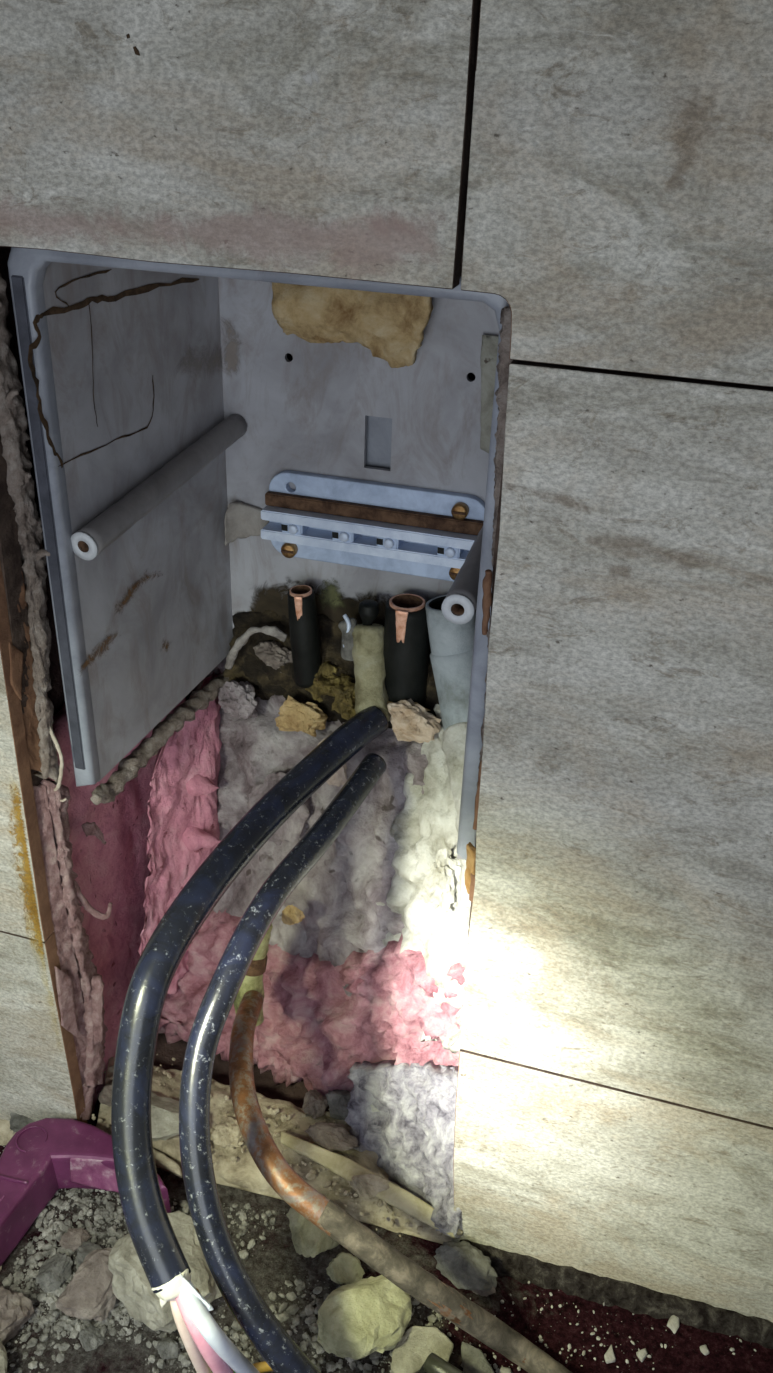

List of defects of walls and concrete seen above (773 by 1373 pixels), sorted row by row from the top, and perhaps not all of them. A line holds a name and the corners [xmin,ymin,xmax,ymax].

crack [28,269,199,468]
rust [10,785,45,959]